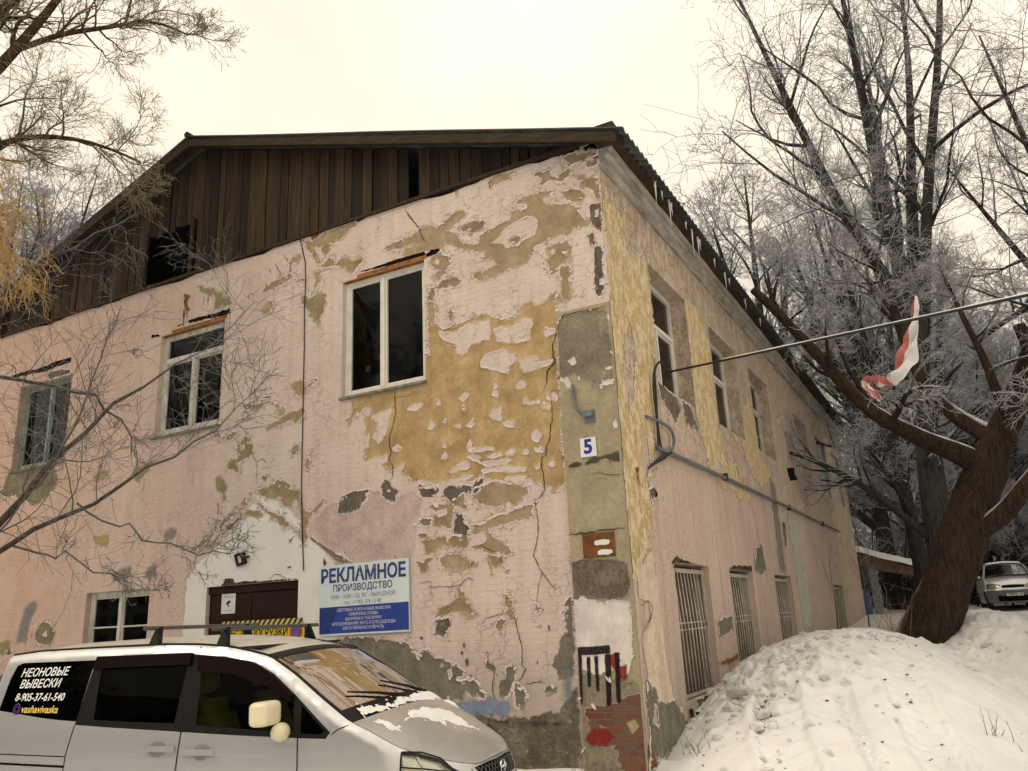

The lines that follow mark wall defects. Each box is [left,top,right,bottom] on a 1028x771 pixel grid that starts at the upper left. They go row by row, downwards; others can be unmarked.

flaking render [178,300,230,326]
peeling [189,148,774,586]
crack [533,307,601,599]
peeling [34,618,55,648]
flaking render [340,588,530,713]
crack [485,607,544,720]
flaking render [490,593,689,771]